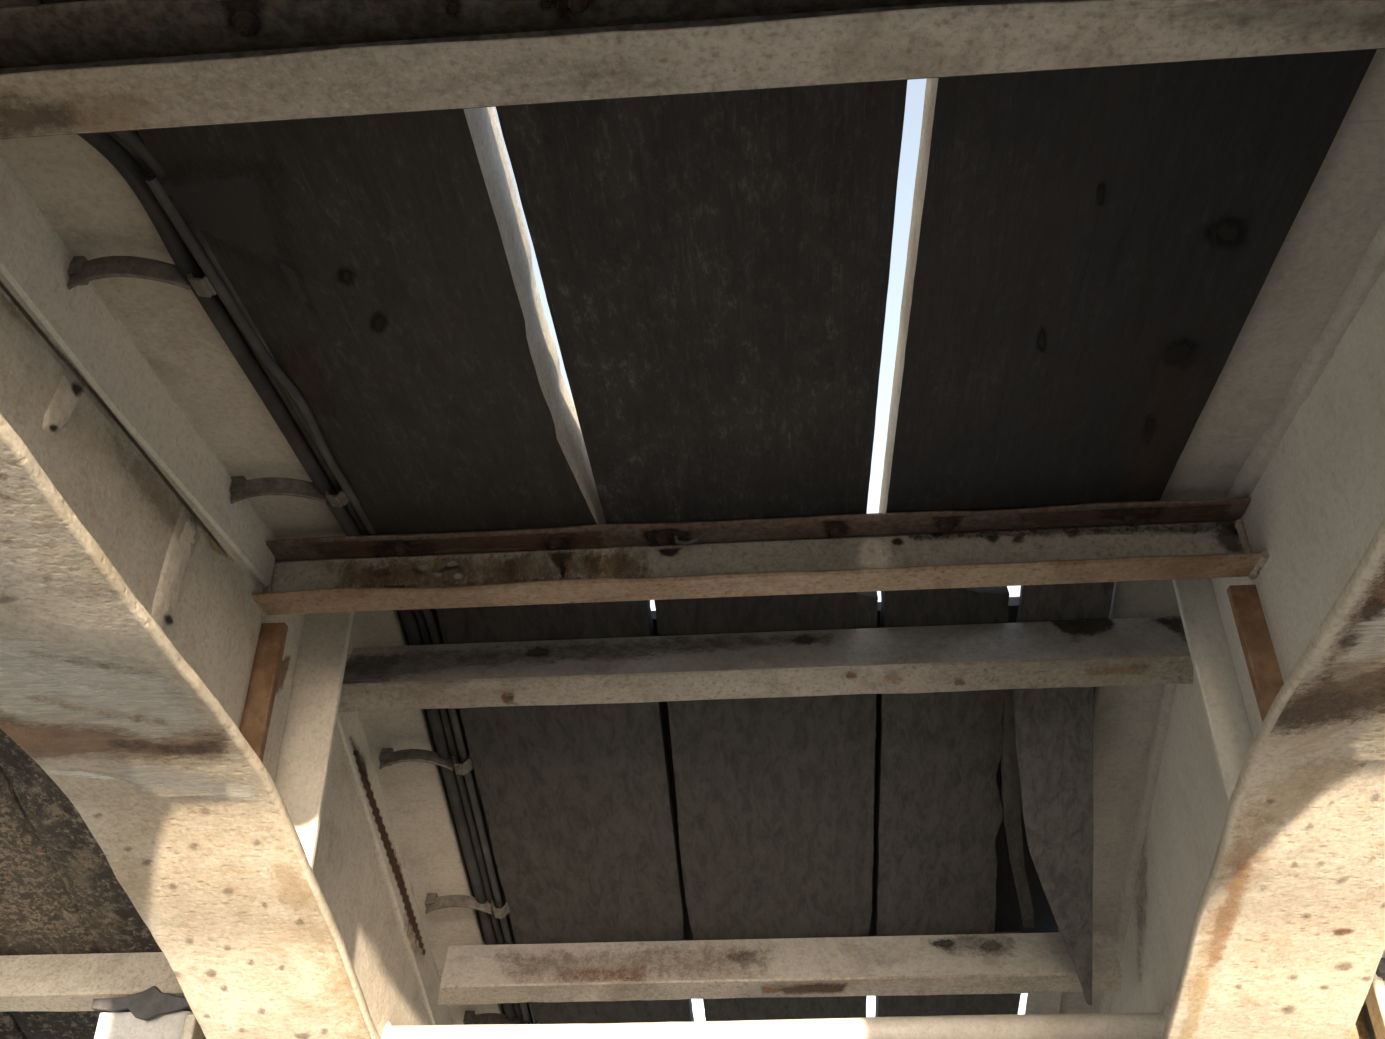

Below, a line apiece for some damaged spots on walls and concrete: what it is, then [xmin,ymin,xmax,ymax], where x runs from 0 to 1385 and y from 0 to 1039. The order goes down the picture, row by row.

corrosion [1018,505,1231,525]
corrosion [317,528,690,588]
corrosion [1271,574,1385,734]
water stain [1333,618,1385,677]
corrosion [0,717,231,762]